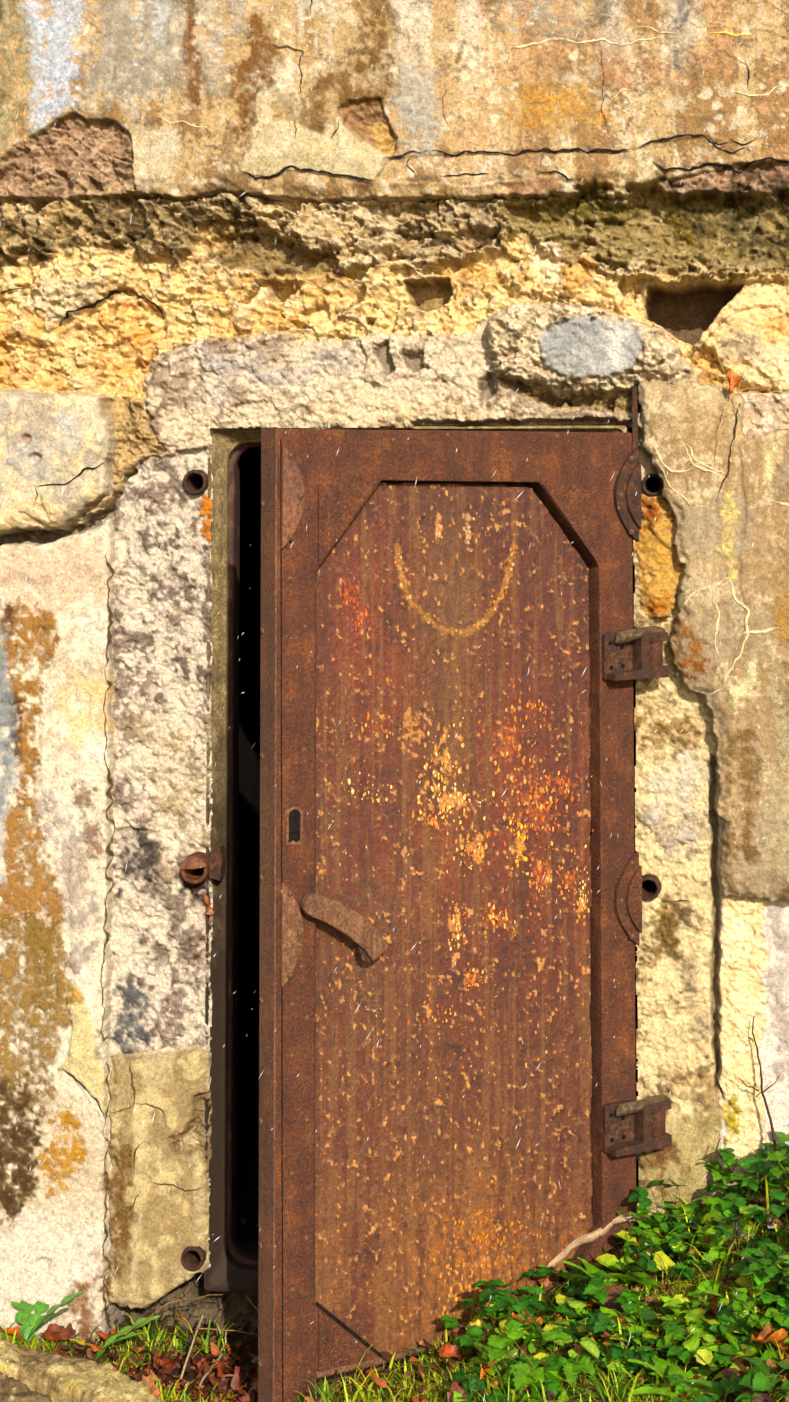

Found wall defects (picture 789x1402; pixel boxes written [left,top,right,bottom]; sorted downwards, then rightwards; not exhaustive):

spalling [338,99,397,155]
crack [242,26,789,182]
water stain [0,631,19,882]
corrosion [332,761,392,822]
corrosion [335,712,401,756]
spalling [0,112,789,1212]
corrosion [401,684,594,926]
corrosion [636,495,710,686]
crack [683,576,779,695]
water stain [0,769,159,1216]
corrosion [367,899,529,1105]
corrosion [424,1157,552,1321]